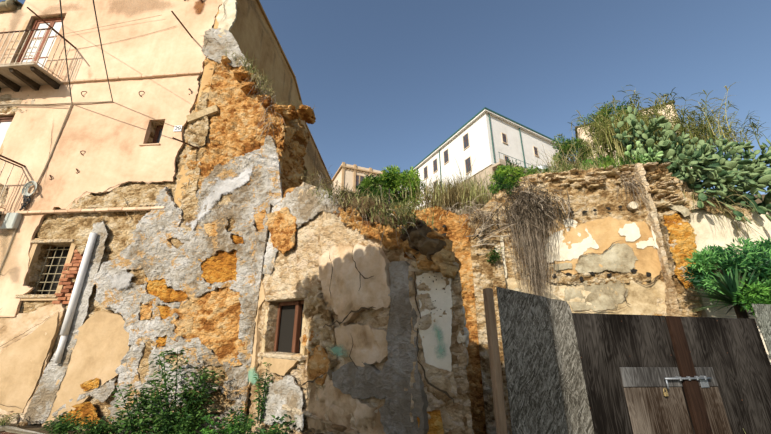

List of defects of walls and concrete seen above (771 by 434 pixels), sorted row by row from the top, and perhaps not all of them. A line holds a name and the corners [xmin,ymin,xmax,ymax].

peeling [38,121,388,434]
peeling [416,271,457,434]
peeling [543,205,662,313]
spalling [663,213,699,289]